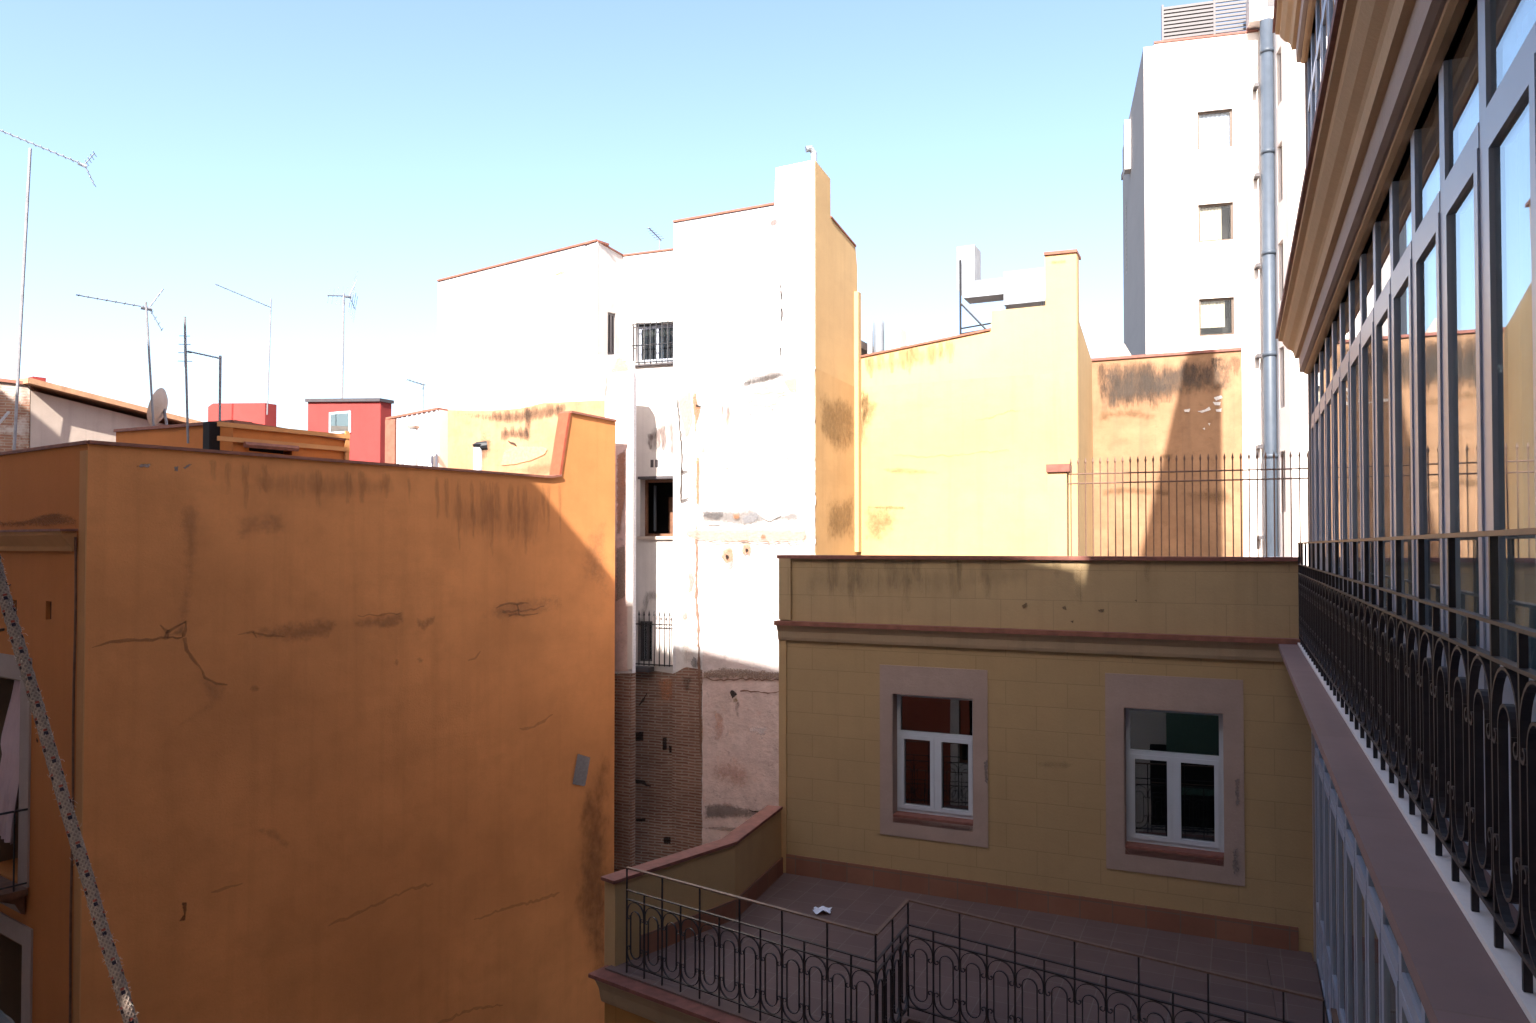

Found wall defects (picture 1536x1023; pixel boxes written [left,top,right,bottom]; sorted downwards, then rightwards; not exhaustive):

peeling [614,367,816,872]
water stain [1106,366,1224,430]